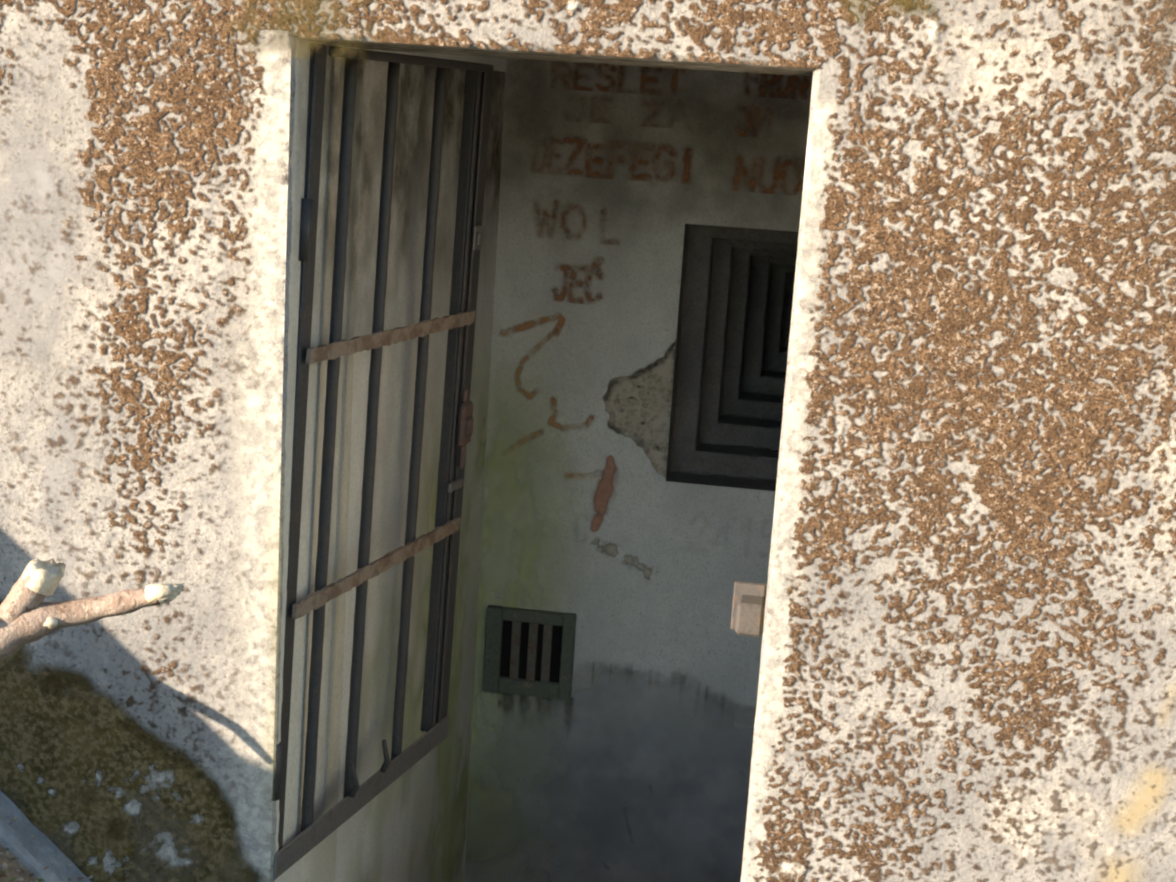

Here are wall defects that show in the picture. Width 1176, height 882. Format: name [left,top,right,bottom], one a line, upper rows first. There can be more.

flaking render [603,341,676,477]
damp [542,673,754,882]